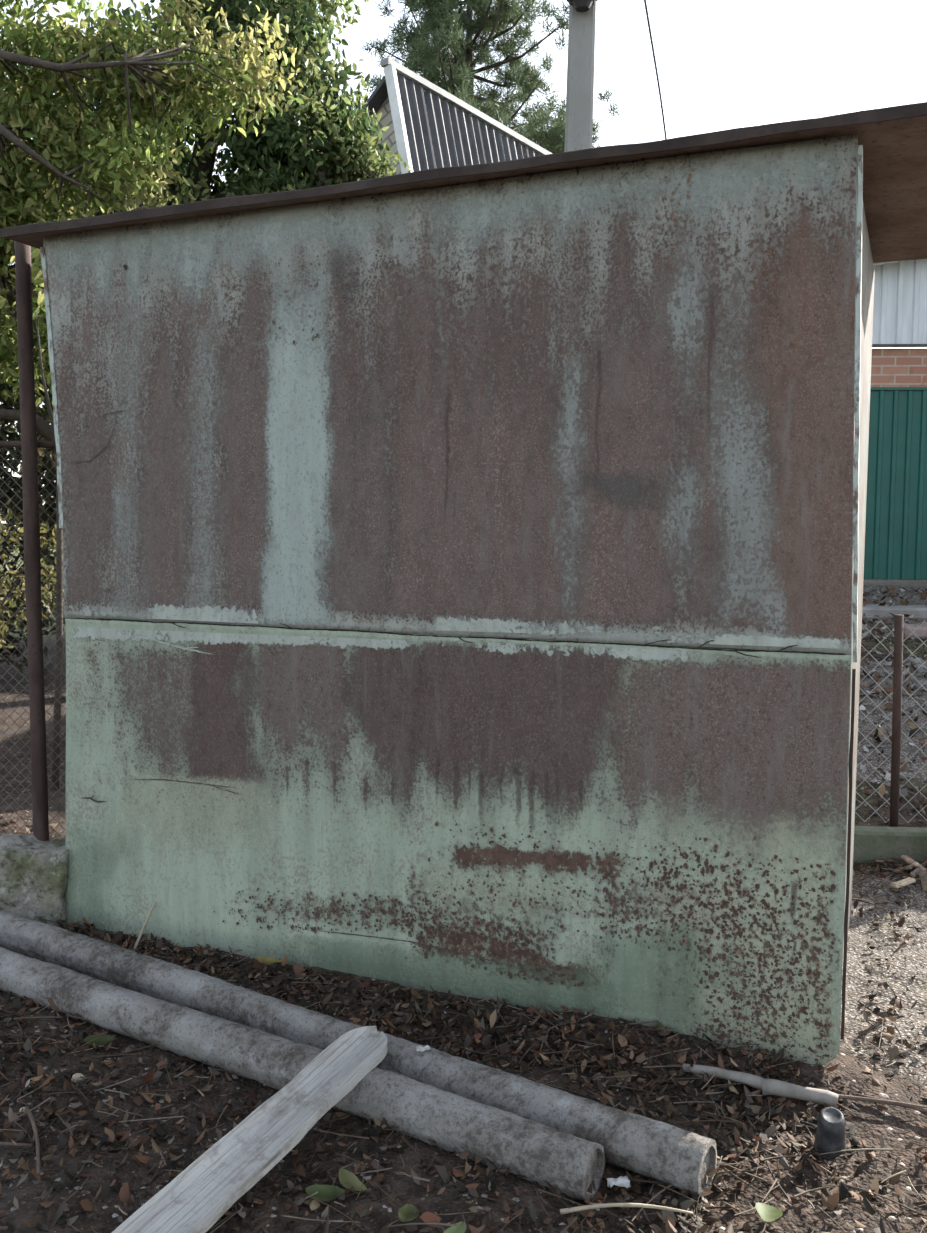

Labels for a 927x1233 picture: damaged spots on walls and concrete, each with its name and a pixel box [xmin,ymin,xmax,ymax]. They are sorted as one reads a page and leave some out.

corrosion [54,140,856,644]
corrosion [85,640,850,1063]